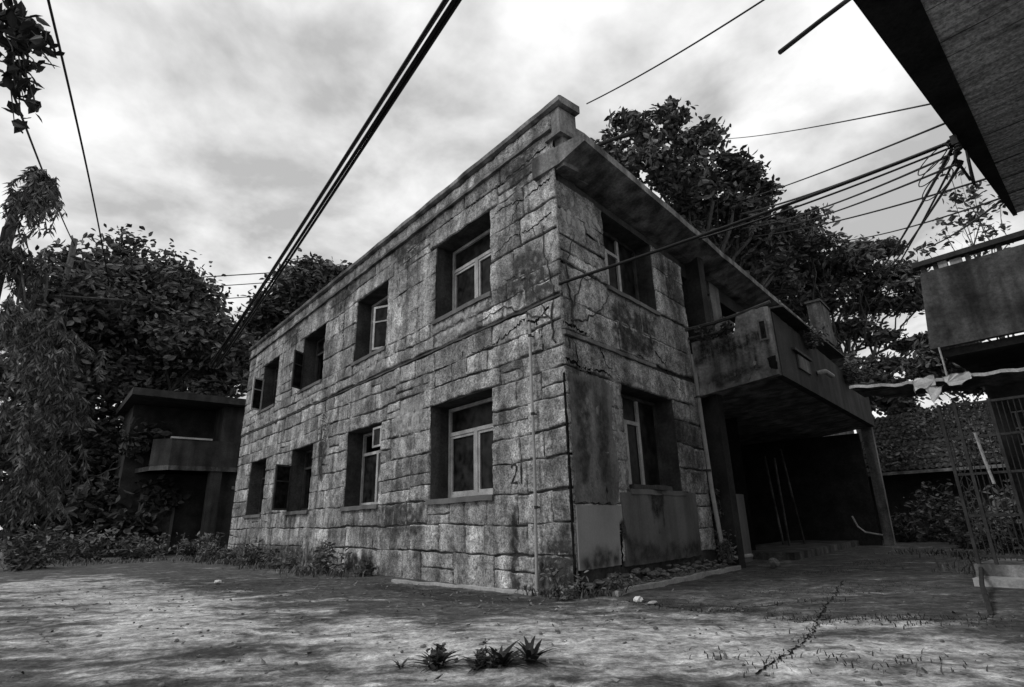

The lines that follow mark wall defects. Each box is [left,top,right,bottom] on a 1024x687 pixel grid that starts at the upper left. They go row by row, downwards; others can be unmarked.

crack [471,306,685,394]